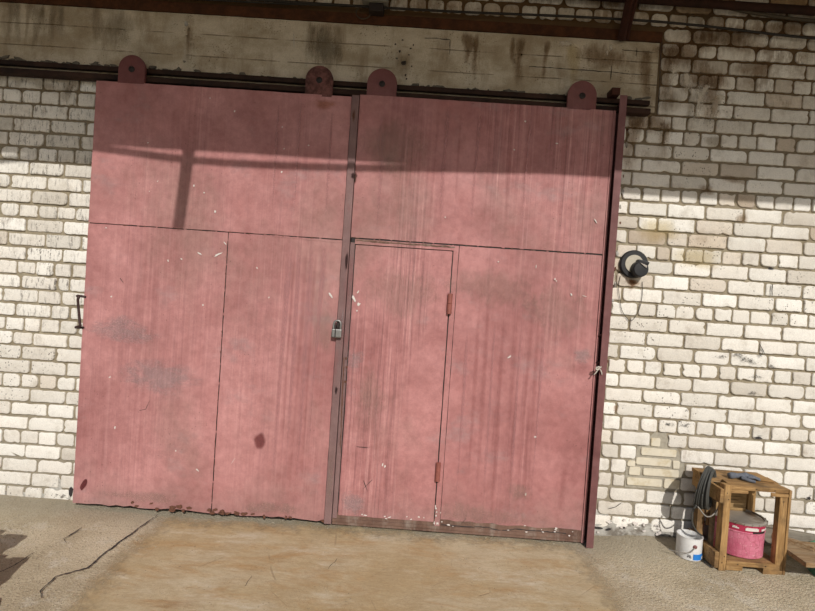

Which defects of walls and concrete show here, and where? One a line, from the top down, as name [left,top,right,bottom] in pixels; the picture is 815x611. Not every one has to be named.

corrosion [207,508,266,519]